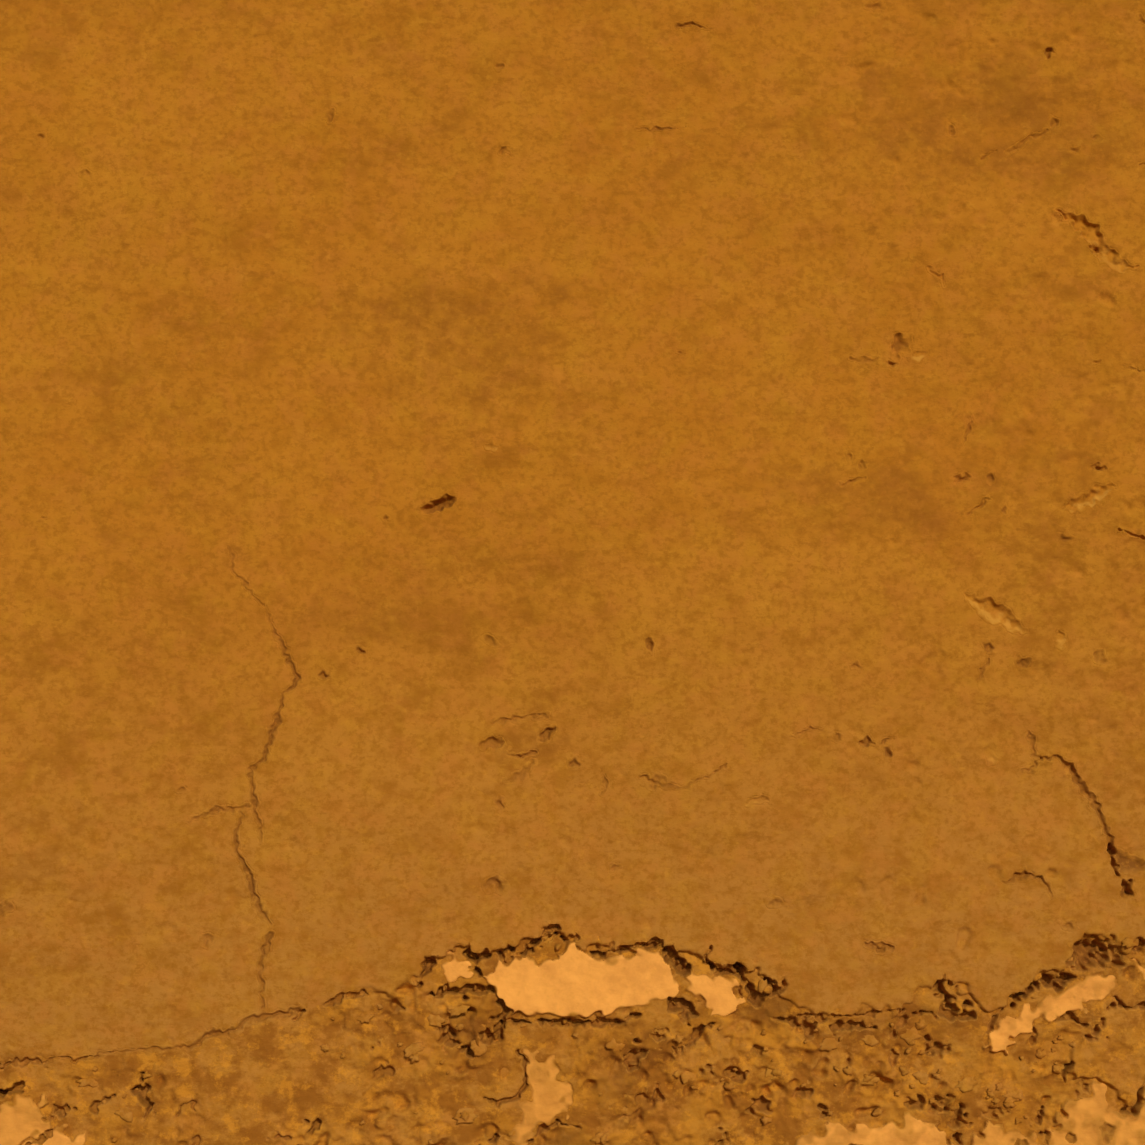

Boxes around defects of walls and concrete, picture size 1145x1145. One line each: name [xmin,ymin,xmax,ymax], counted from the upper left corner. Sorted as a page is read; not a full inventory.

crack [38,544,307,1067]
crack [1015,728,1145,905]
spalling [0,920,1145,1145]